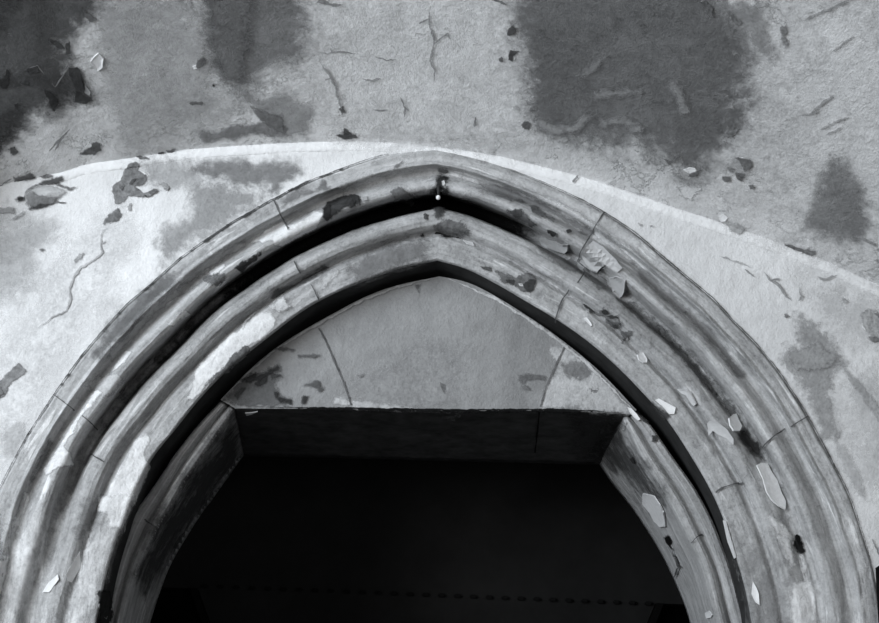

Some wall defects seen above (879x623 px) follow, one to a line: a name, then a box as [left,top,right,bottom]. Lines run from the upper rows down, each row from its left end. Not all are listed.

spalling [44,39,91,111]
leakage [199,0,312,143]
crack [419,12,451,79]
leakage [511,0,772,172]
peeling [103,149,176,225]
peeling [322,194,368,221]
leakage [806,160,869,242]
crack [1,154,403,484]
peeling [860,309,879,342]
peeling [0,363,27,398]
leakage [783,313,879,497]
peeling [756,463,786,510]